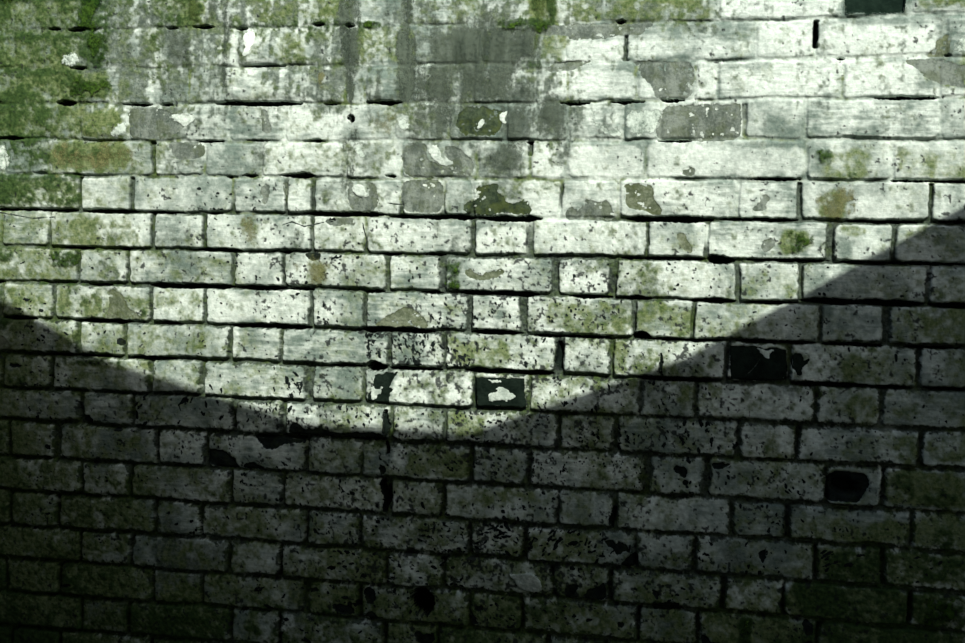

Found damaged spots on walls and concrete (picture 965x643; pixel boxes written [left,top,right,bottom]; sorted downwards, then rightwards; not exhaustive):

leakage [219,2,232,91]
leakage [336,0,361,105]
leakage [396,0,571,171]
spalling [197,182,261,304]
peeling [463,183,532,216]
peeling [624,183,662,215]
spalling [240,296,485,450]
flaking render [421,268,622,475]
flaking render [730,337,810,402]
spalling [294,404,647,628]
spalling [824,471,869,503]